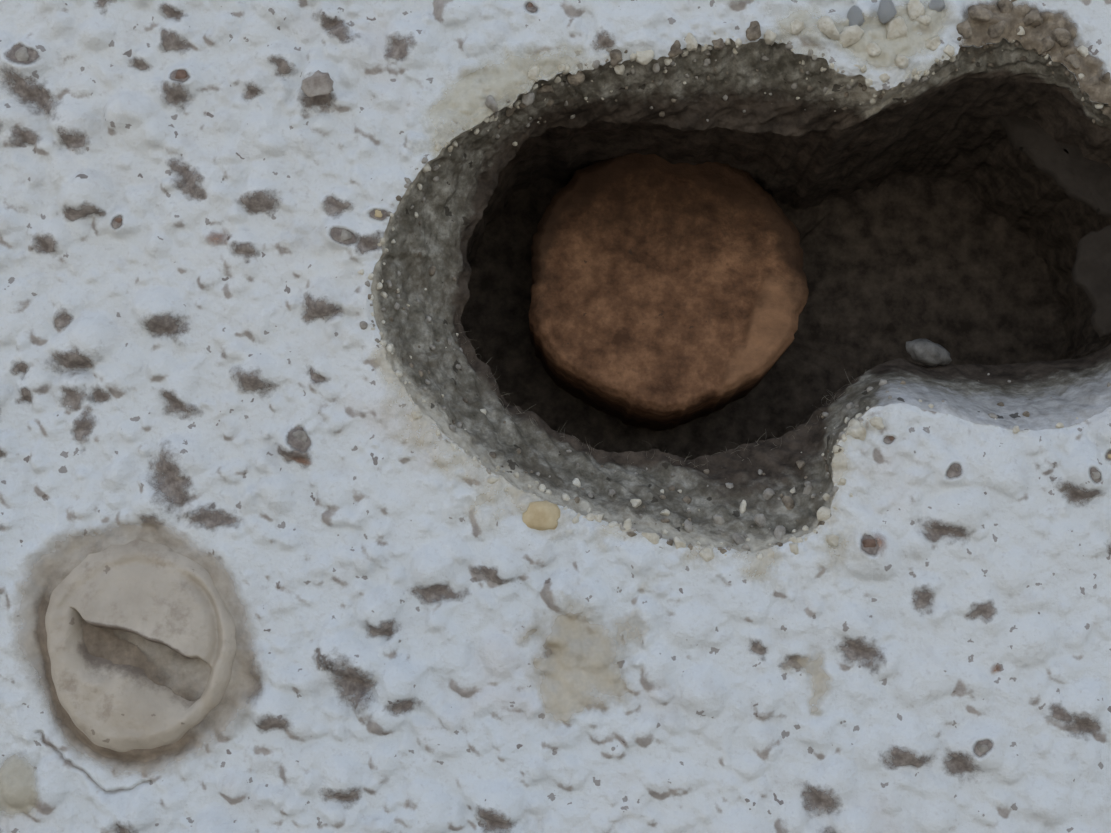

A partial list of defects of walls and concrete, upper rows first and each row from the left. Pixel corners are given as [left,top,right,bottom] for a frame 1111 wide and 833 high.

spalling [321,0,1111,562]